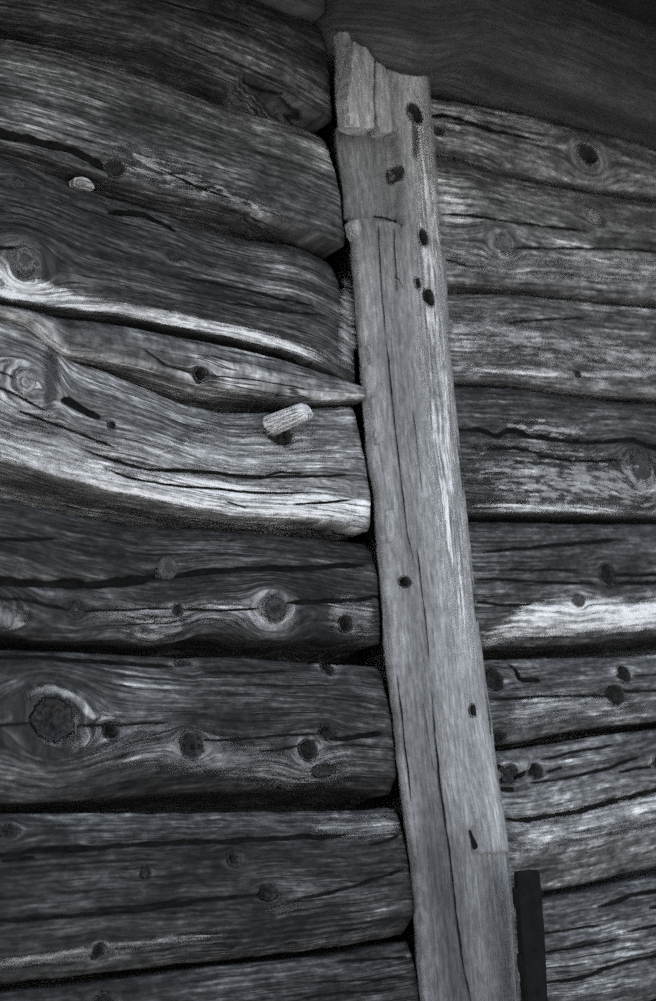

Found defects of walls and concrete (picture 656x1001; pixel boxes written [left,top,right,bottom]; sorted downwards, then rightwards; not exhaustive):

crack [0,371,350,508]
crack [458,427,656,463]
crack [544,889,656,984]